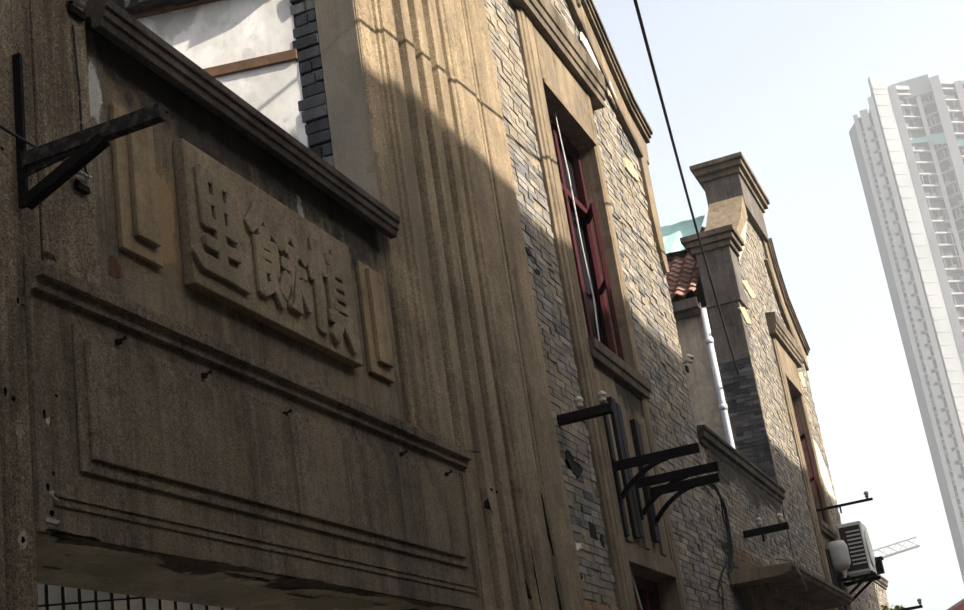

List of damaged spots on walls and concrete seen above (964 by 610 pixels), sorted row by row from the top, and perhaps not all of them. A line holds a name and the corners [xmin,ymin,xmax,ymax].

peeling [55,537,389,606]